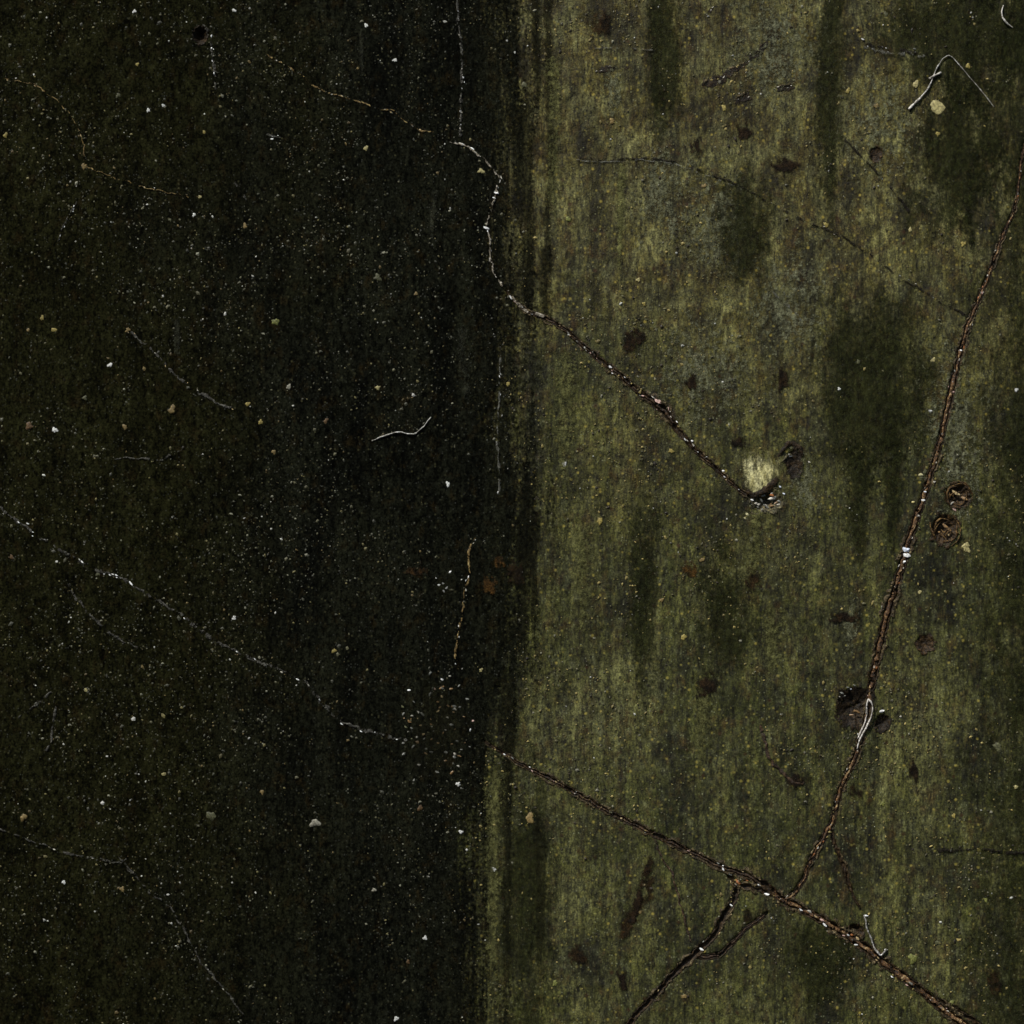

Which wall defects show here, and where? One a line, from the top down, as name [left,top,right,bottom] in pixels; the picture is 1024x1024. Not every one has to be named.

leakage [614,129,839,443]
leakage [731,122,752,140]
leakage [720,0,834,117]
crack [485,139,1024,1024]
leakage [837,0,1024,1024]